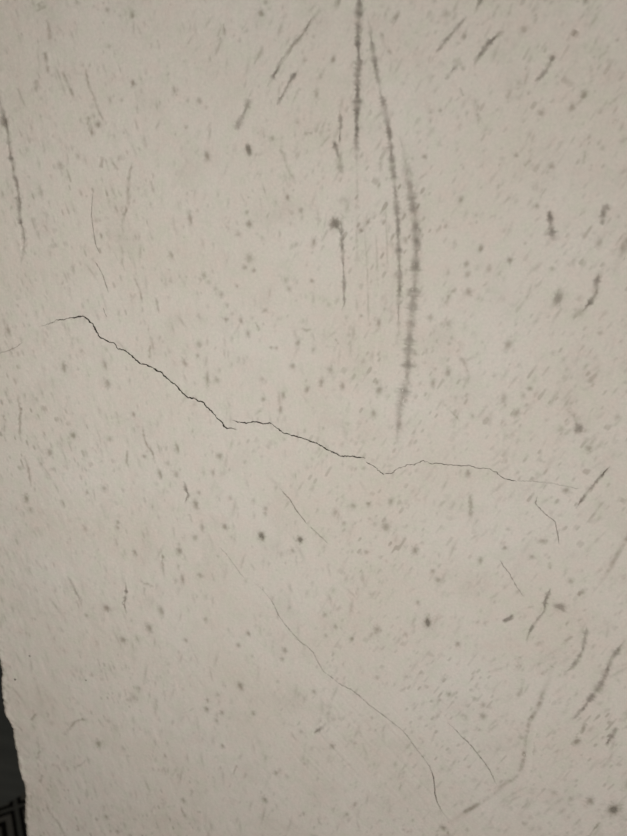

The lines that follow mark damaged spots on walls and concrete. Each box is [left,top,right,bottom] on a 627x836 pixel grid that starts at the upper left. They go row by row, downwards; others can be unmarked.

crack [52,316,515,481]